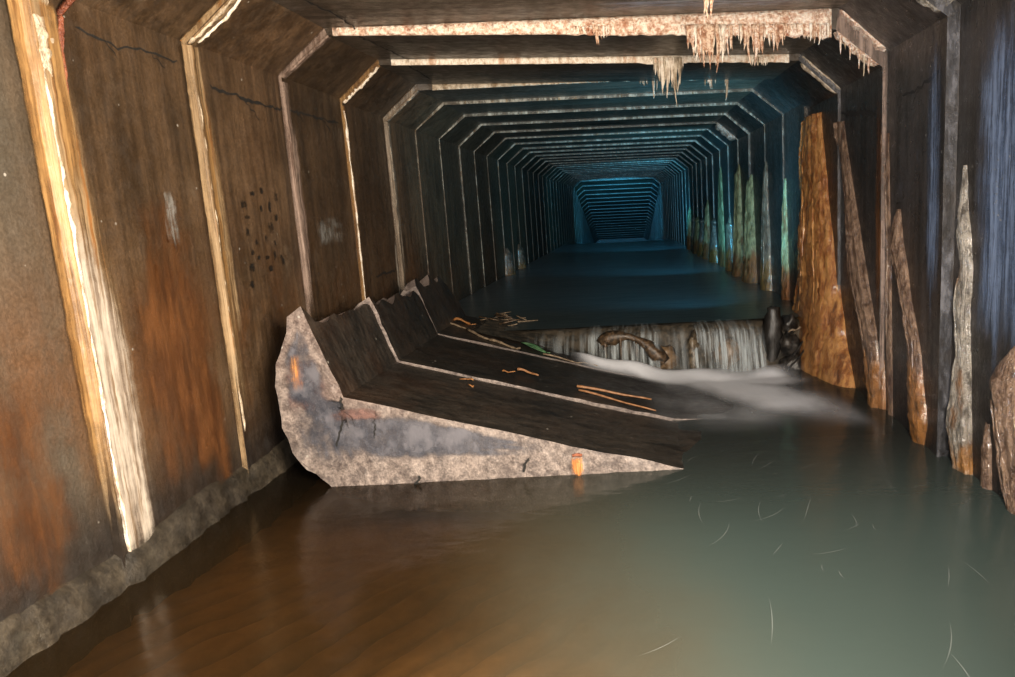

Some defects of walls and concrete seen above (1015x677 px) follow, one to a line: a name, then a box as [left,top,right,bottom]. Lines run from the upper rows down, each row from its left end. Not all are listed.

crack [75,26,177,67]
crack [210,85,339,133]
water stain [833,10,886,154]
water stain [7,0,153,552]